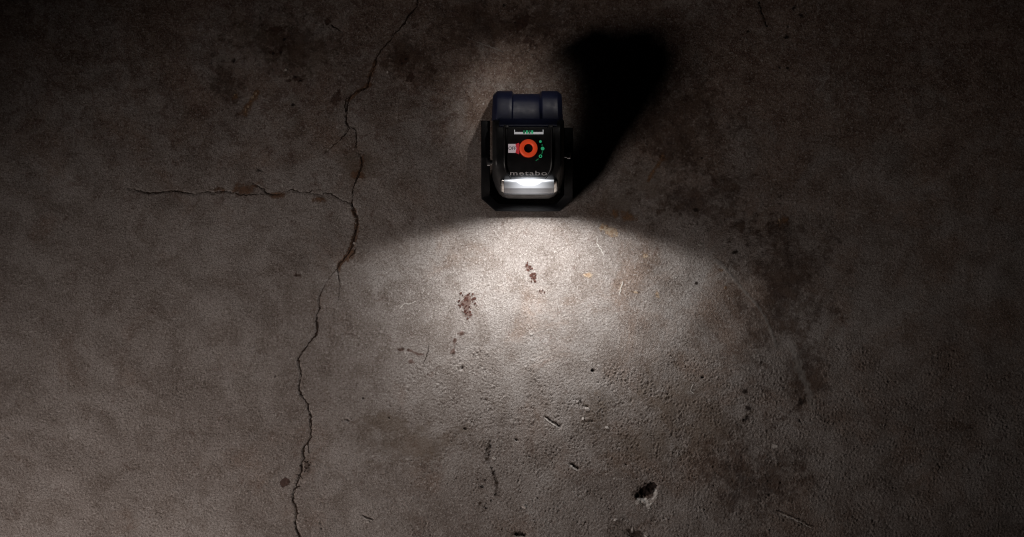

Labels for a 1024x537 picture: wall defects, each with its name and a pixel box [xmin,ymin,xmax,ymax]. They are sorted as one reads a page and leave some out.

crack [133,0,418,537]